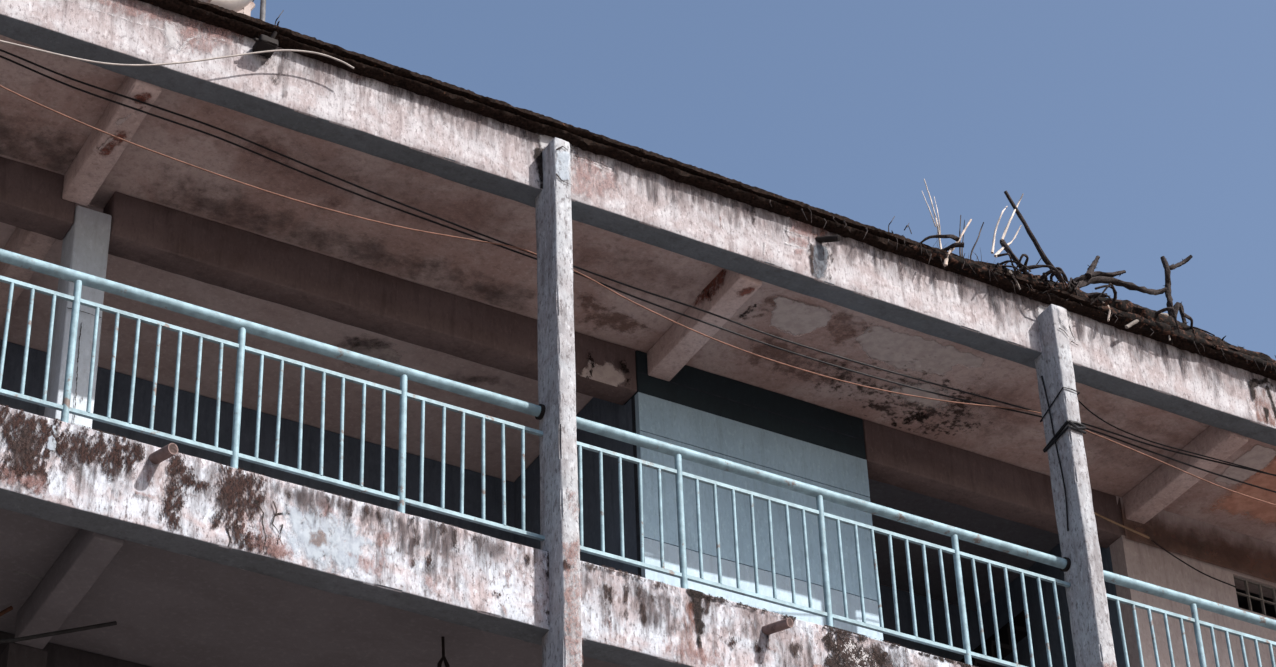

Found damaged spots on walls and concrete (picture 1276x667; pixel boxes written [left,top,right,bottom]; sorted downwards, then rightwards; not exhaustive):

water stain [389,84,481,126]
water stain [534,147,546,189]
water stain [808,228,973,298]
peeling [695,269,726,305]
peeling [739,288,984,376]
peeling [581,352,631,387]